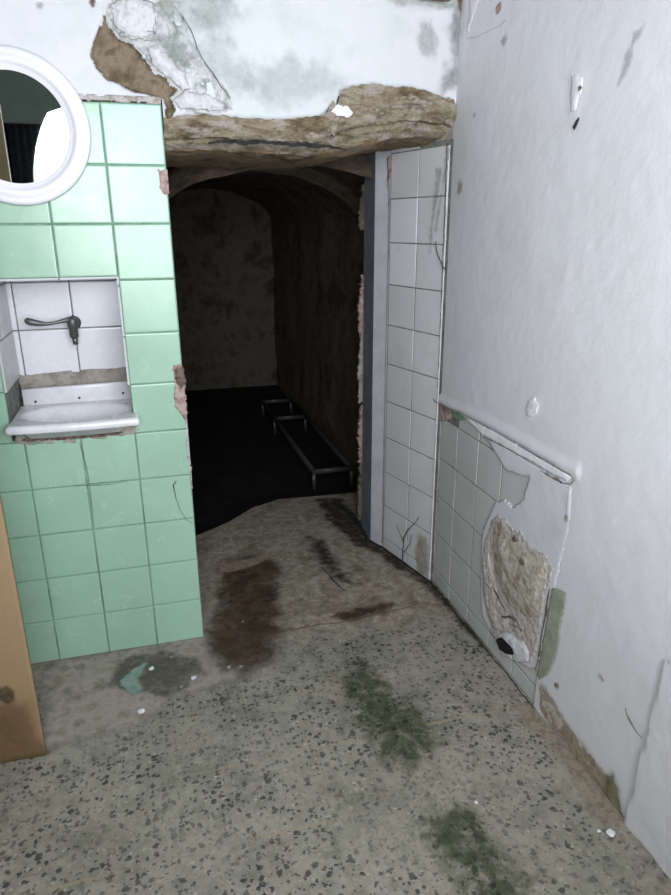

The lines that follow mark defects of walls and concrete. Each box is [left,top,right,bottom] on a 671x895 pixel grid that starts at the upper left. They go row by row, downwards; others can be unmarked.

crack [182,16,231,98]
flaking render [90,0,457,157]
leakage [427,0,461,48]
spalling [467,418,572,671]
leakage [210,557,281,672]